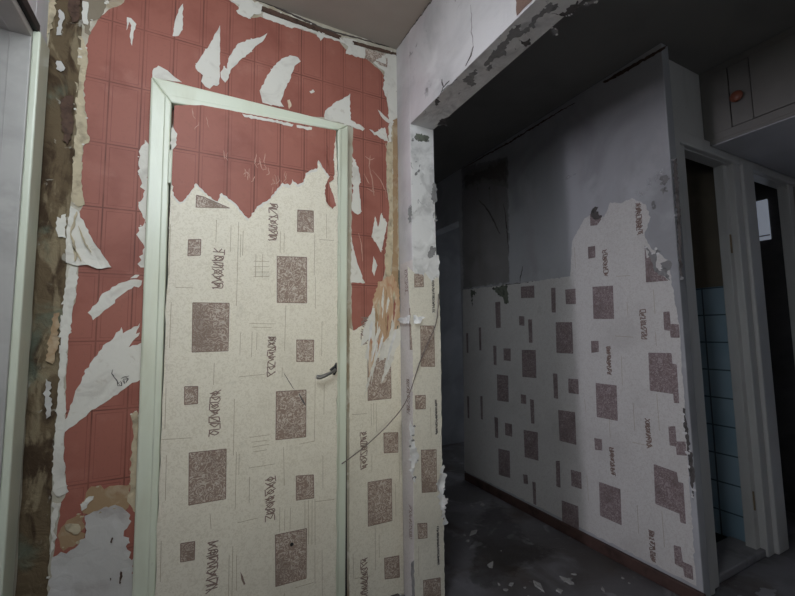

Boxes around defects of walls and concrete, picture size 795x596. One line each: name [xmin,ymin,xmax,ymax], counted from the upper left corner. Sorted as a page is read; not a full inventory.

flaking render [230,0,365,58]
spalling [462,0,598,87]
spalling [659,158,684,280]
flaking render [15,0,111,596]